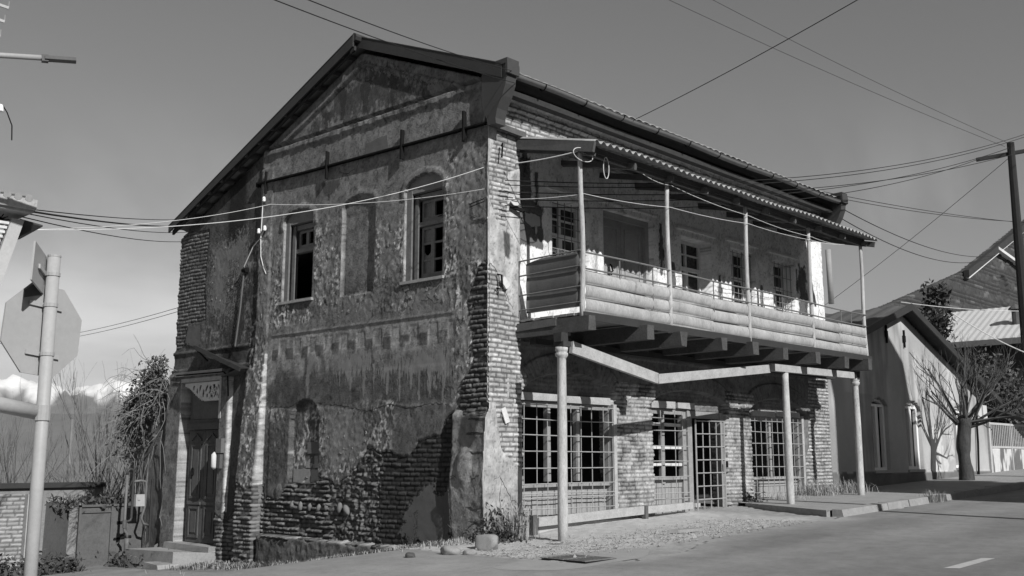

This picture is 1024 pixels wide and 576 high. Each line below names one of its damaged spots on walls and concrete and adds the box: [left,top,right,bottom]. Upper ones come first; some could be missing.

flaking render [213,103,821,564]